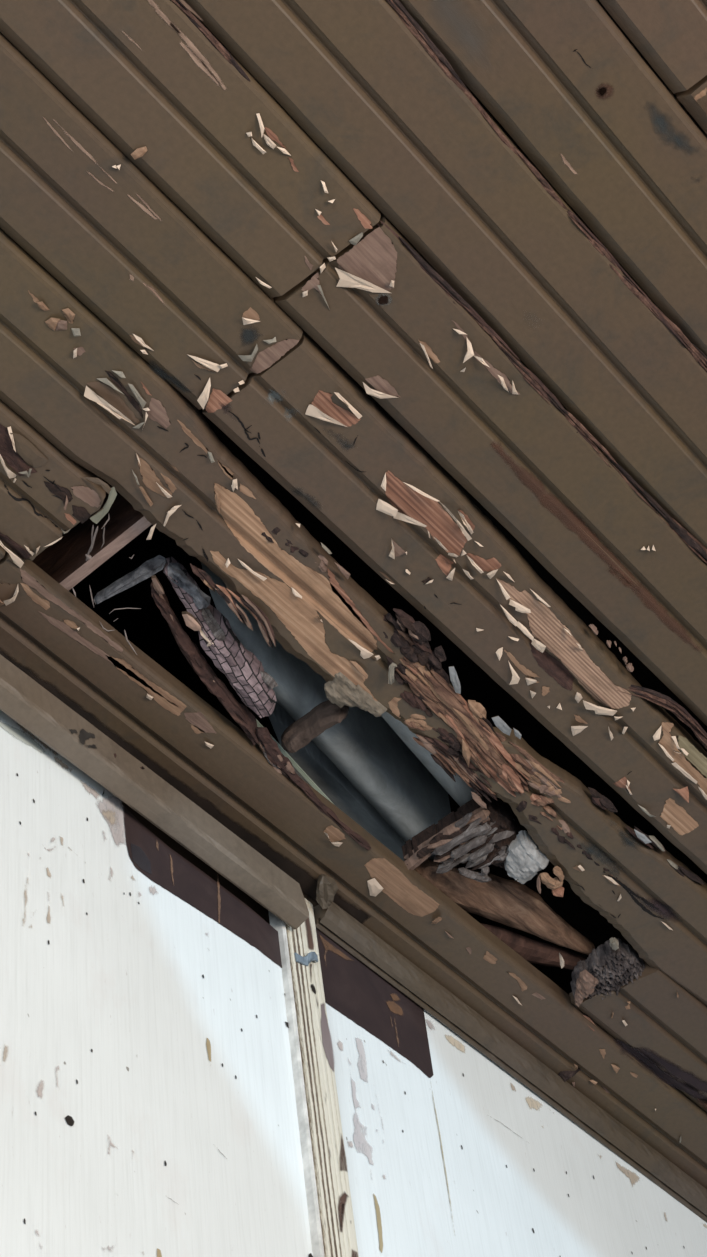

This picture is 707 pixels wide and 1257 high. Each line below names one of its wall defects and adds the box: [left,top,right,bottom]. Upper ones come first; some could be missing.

peeling [246,113,299,172]
peeling [315,180,335,225]
peeling [301,208,397,308]
peeling [187,336,299,413]
peeling [452,320,520,395]
peeling [0,424,216,749]
peeling [376,470,636,740]
peeling [613,722,707,835]
peeling [83,783,282,968]
peeling [364,858,454,939]
peeling [634,829,651,844]
peeling [305,917,465,1171]